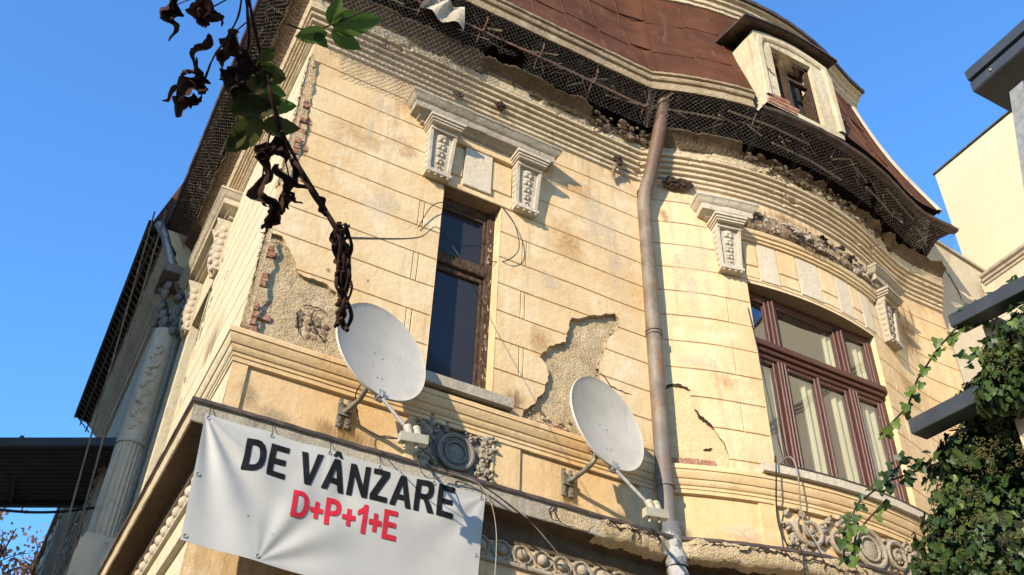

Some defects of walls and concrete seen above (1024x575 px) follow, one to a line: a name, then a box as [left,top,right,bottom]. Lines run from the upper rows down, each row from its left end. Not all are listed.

flaking render [239,228,342,359]
flaking render [746,215,882,290]
flaking render [522,313,620,436]